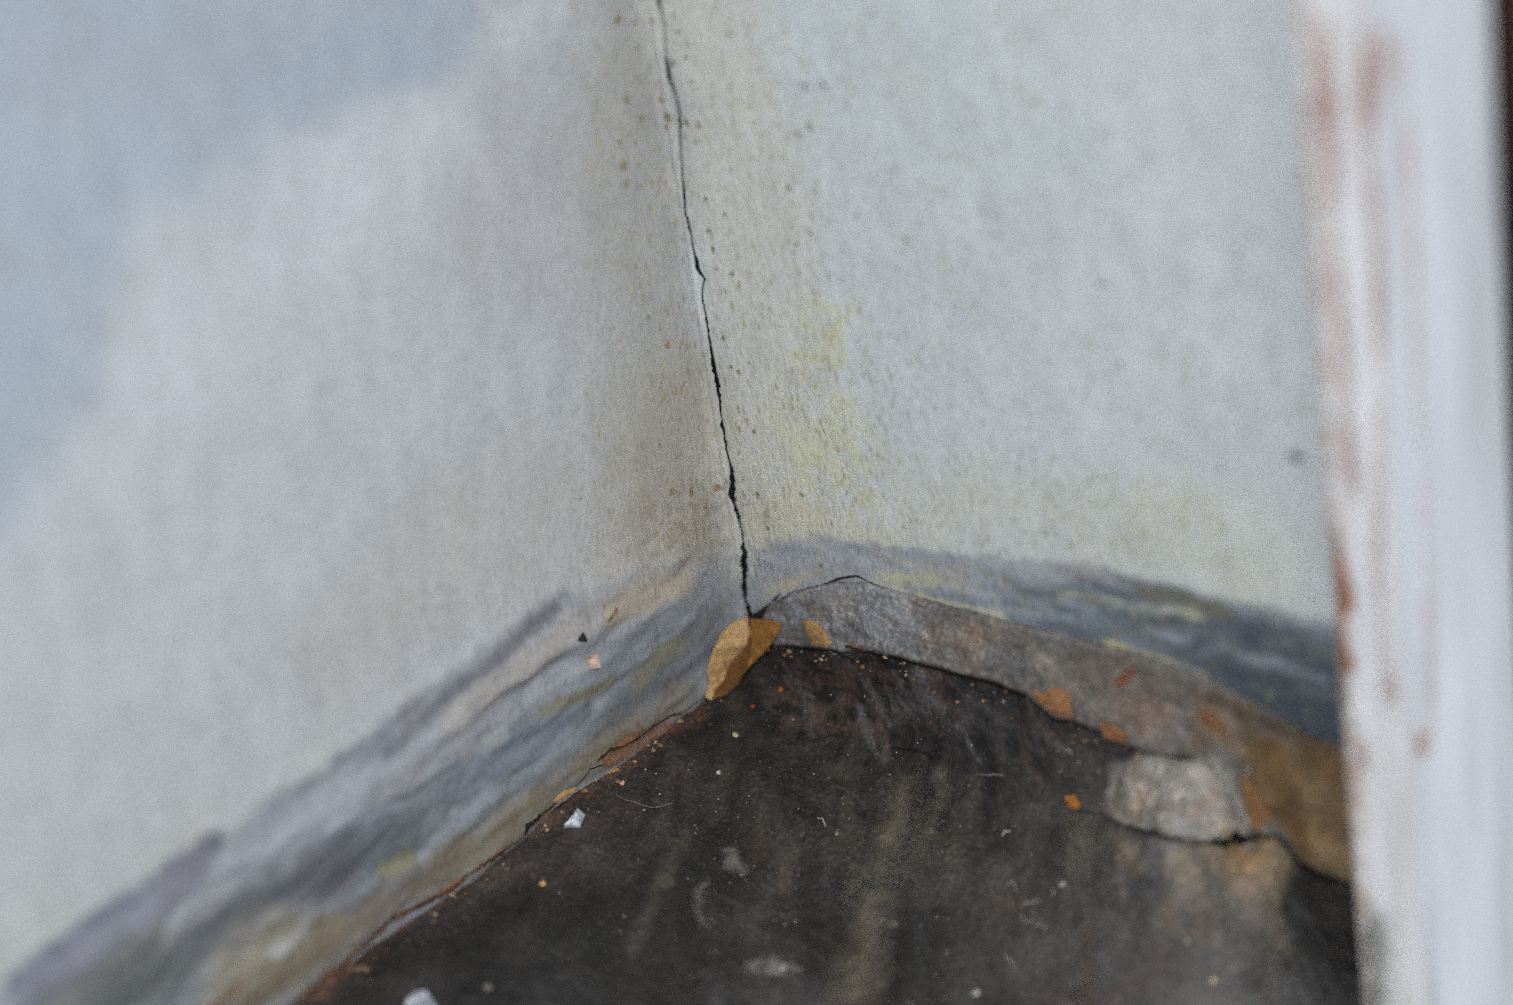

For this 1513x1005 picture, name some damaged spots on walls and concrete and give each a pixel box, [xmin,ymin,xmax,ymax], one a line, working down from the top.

crack [657,0,1027,699]
spalling [706,617,781,700]
spalling [800,619,832,647]
leakage [725,849,744,871]
crack [1074,809,1355,892]